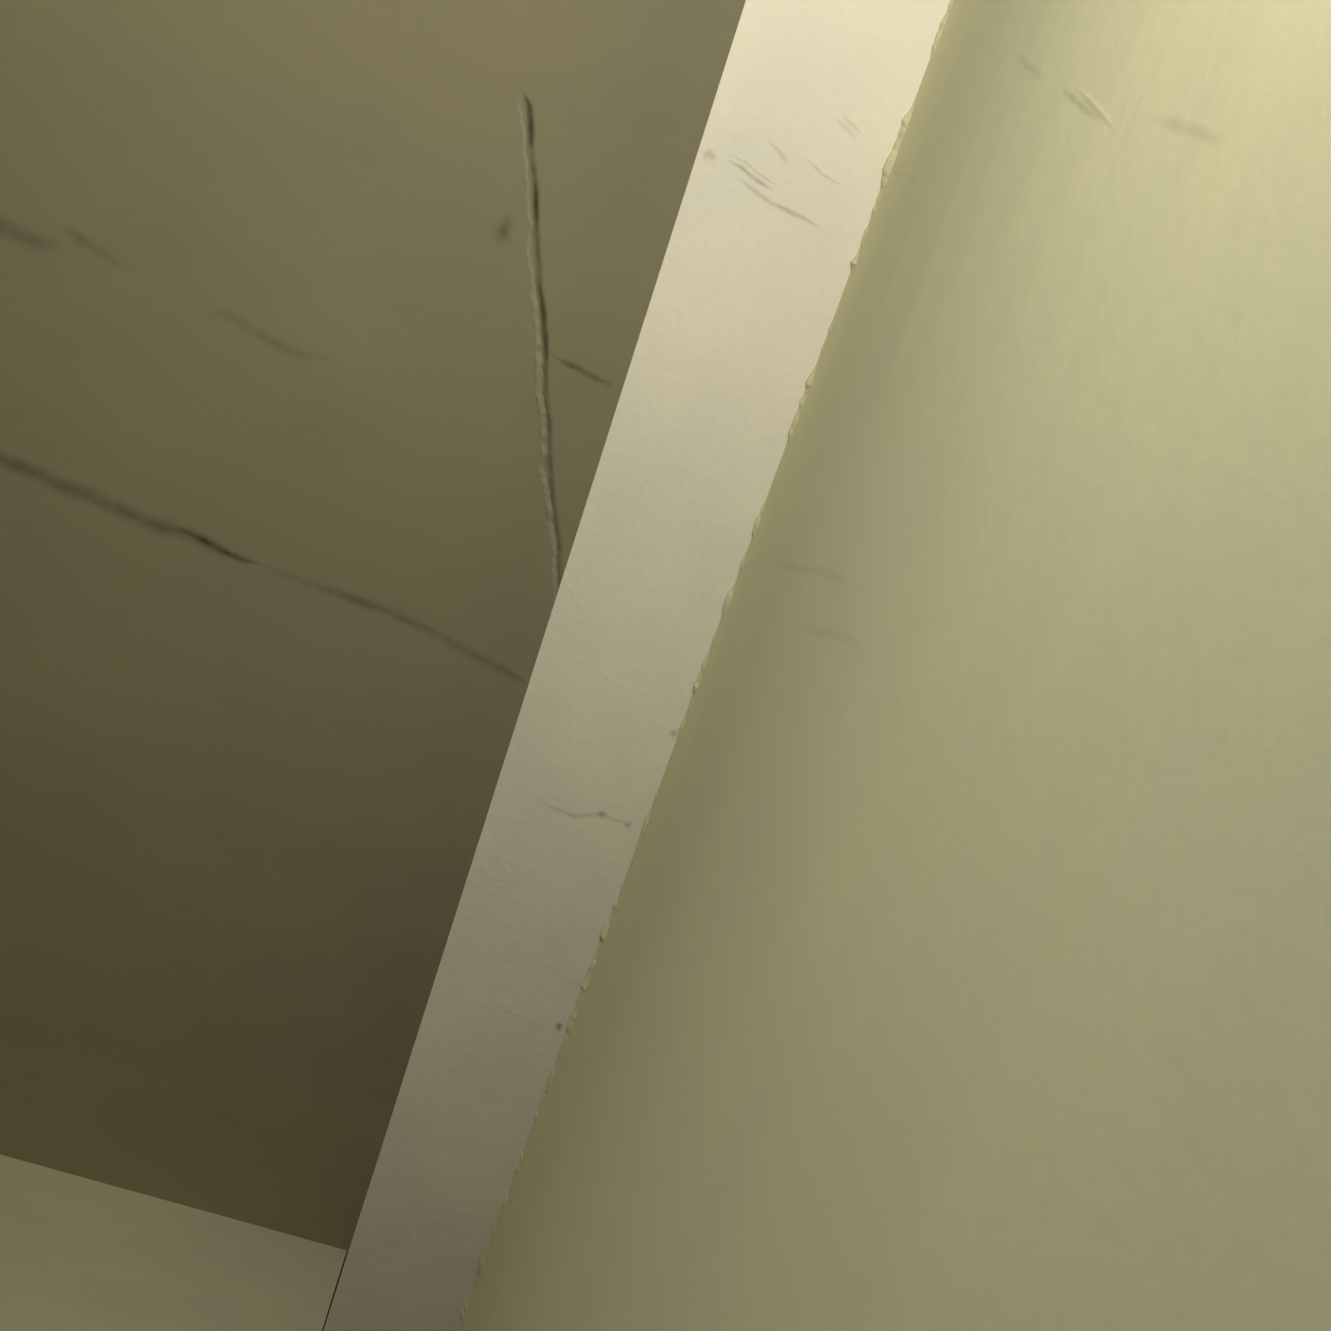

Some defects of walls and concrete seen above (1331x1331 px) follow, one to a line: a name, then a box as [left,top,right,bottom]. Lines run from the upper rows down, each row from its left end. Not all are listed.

crack [517,102,558,614]